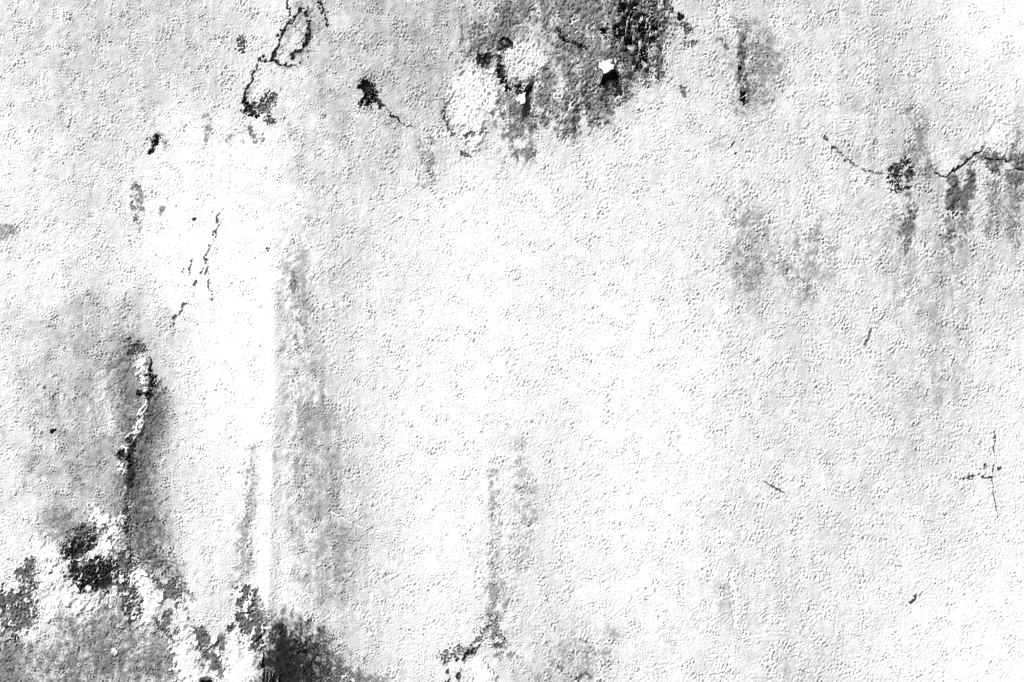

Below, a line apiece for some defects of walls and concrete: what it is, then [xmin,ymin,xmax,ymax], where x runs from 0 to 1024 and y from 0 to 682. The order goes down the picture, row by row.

crack [242,0,329,105]
crack [374,99,412,127]
damp [450,0,674,164]
damp [716,18,780,115]
crack [823,135,883,175]
crack [934,151,1024,181]
peeling [0,334,268,682]
crack [962,431,1001,518]